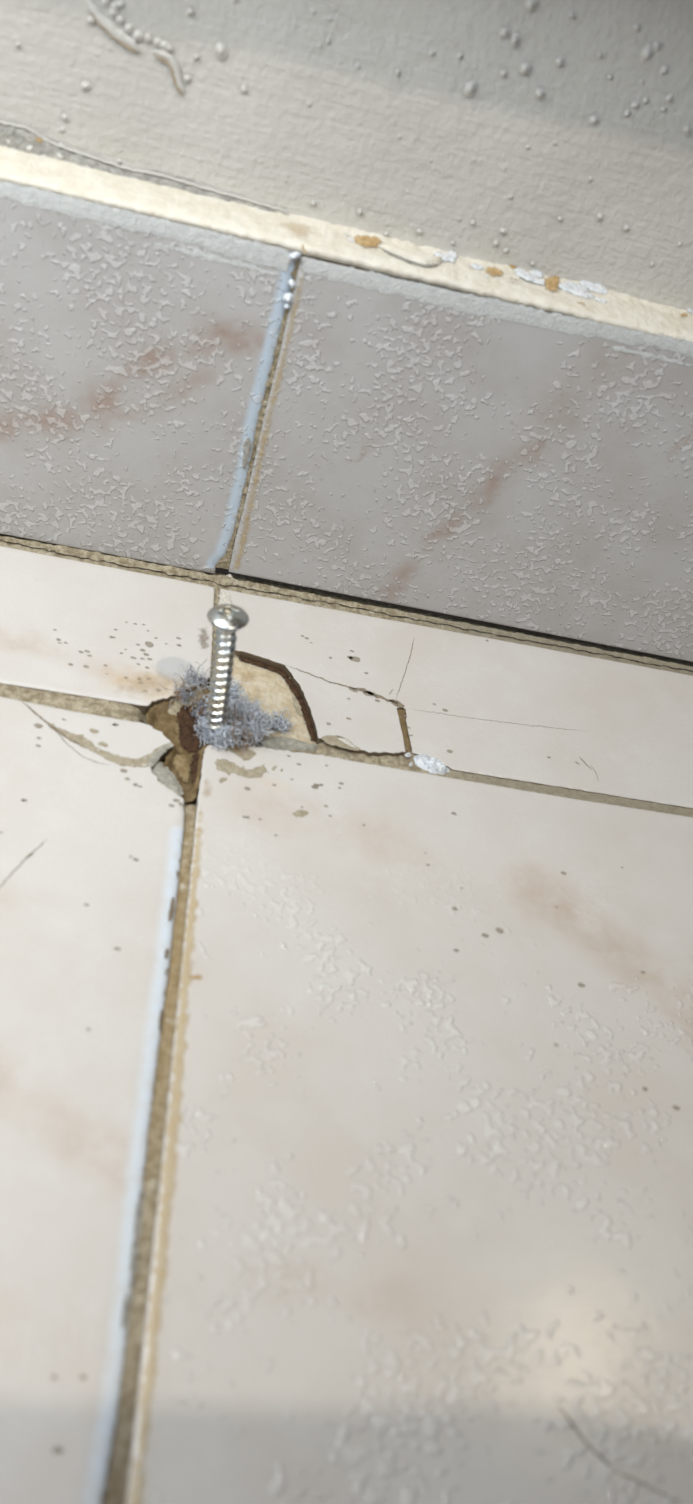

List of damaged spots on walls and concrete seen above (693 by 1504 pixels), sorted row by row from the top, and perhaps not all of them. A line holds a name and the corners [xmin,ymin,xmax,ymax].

crack [22,701,108,765]
spalling [53,622,210,807]
spalling [231,656,361,786]